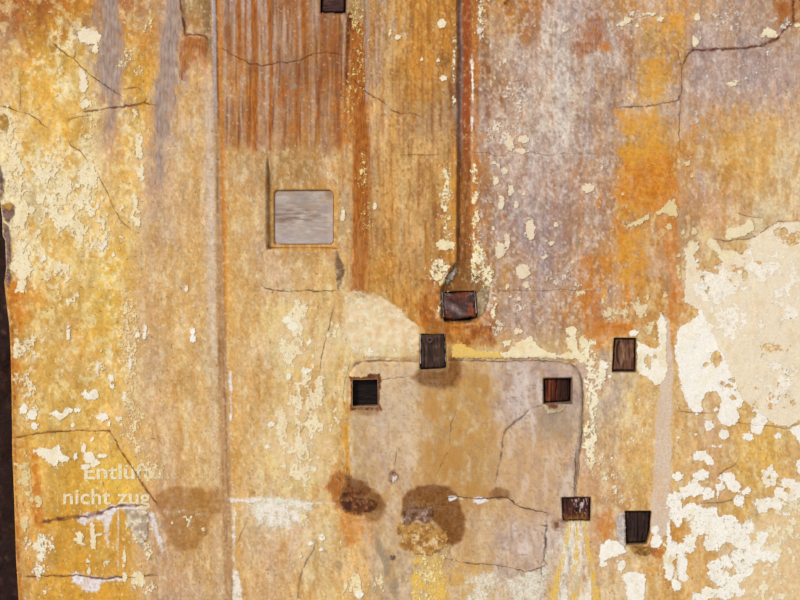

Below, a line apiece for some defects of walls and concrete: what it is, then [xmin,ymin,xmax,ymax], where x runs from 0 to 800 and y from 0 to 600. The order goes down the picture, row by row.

crack [54,44,150,118]
crack [626,0,795,139]
peeling [0,103,124,306]
rust [342,12,371,298]
peeling [424,166,457,292]
rust [613,107,681,220]
rust [581,255,635,348]
peeling [265,299,340,492]
peeling [451,161,800,600]
crack [15,430,157,523]
water stain [72,486,322,600]
water stain [401,484,466,546]